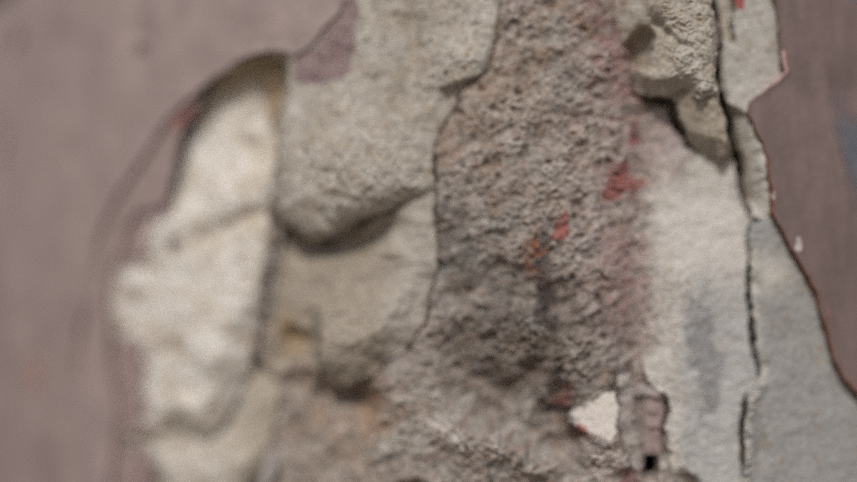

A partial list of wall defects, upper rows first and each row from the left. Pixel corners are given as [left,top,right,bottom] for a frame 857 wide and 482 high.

spalling [109,12,341,482]
crack [269,202,409,243]
crack [432,161,440,207]
peeling [610,363,630,389]
spalling [633,152,760,482]
crack [711,2,747,208]
crack [738,264,759,476]